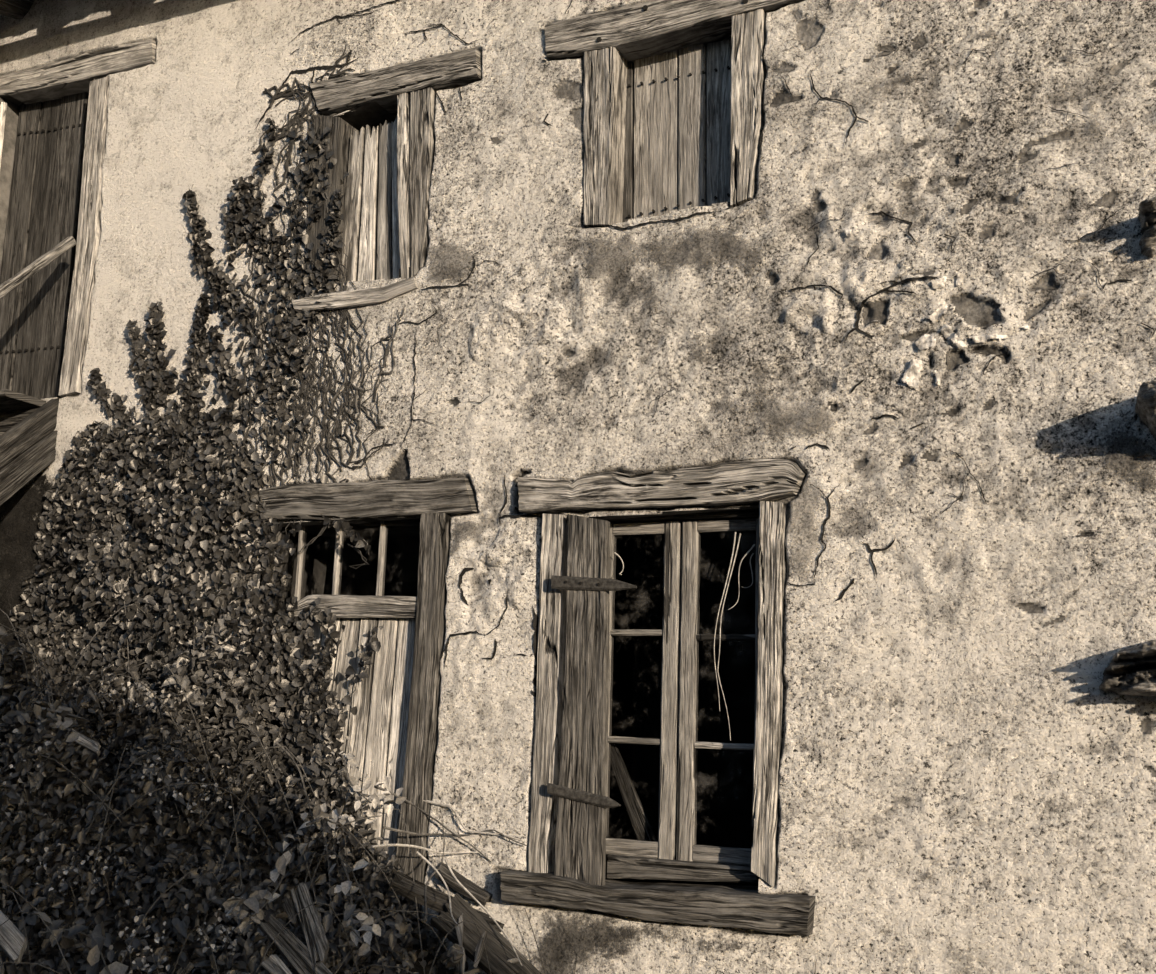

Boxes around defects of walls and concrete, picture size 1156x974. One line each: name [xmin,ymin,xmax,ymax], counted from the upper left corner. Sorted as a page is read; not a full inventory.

crack [760,16,869,155]
peeling [812,188,826,212]
peeling [870,244,889,260]
peeling [834,298,888,326]
peeling [902,270,1010,390]
peeling [1021,274,1058,329]
crack [790,443,830,451]
crack [787,483,895,602]